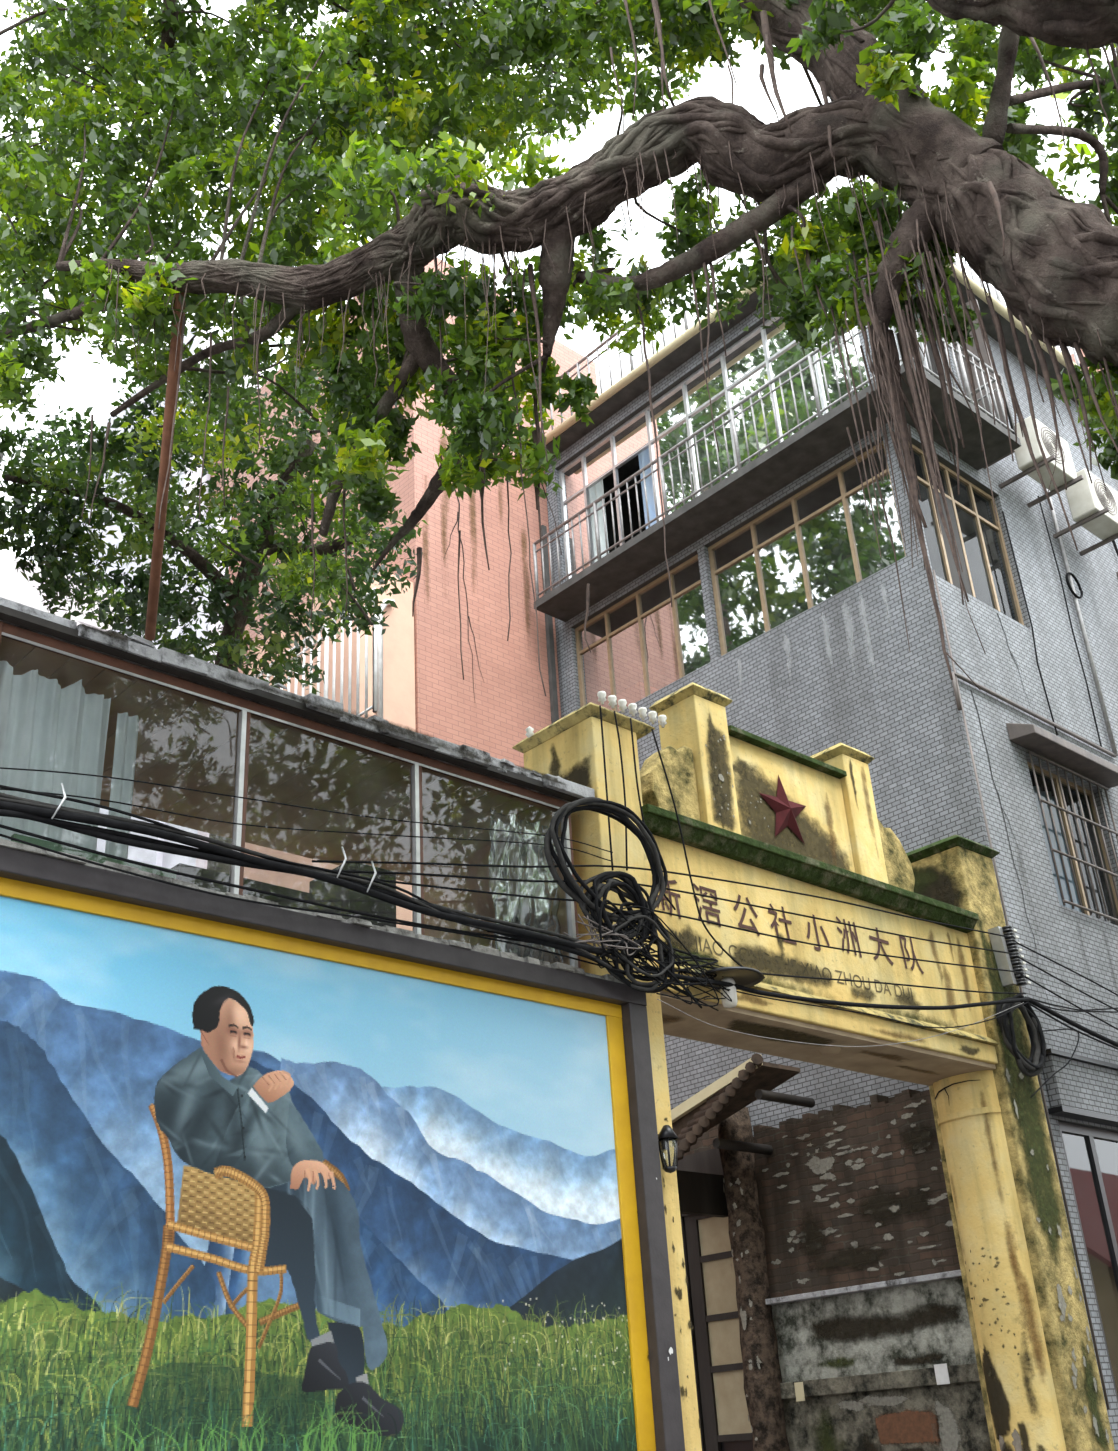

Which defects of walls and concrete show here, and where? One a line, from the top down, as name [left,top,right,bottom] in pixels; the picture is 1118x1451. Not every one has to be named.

leakage [706,714,849,871]
leakage [850,760,872,825]
peeling [762,1099,947,1276]
leakage [837,1395,908,1411]
leakage [935,1400,961,1451]
spalling [965,1247,1045,1451]